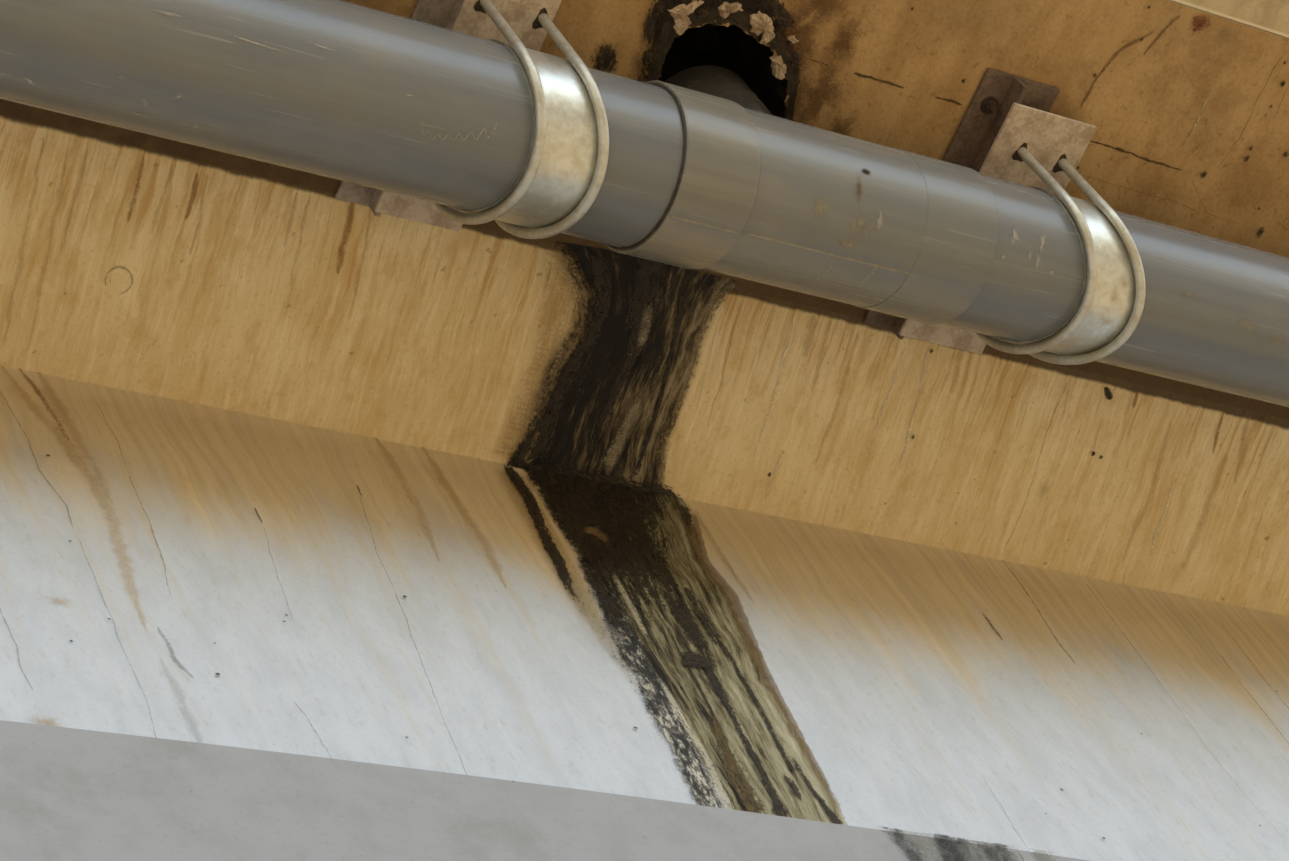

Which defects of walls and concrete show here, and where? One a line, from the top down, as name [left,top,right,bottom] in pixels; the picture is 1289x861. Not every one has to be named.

spalling [636,0,810,123]
water stain [504,242,847,825]
crack [1003,562,1075,663]
water stain [882,826,1056,861]